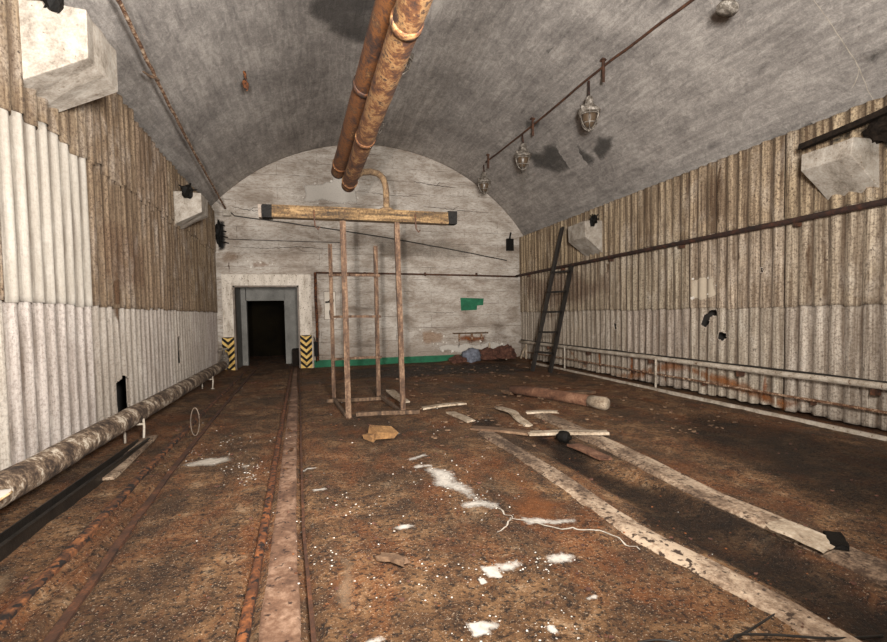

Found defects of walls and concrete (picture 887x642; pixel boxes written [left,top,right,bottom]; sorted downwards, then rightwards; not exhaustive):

leakage [312,0,375,42]